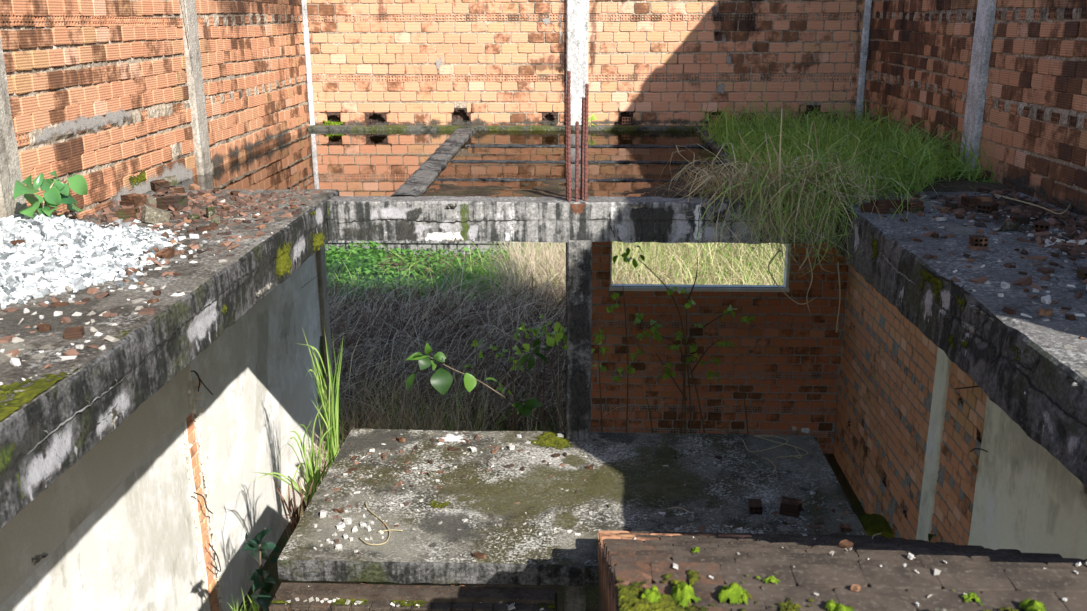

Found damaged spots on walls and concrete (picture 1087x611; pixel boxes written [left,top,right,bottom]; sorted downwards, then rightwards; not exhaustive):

damp [340,204,478,241]
damp [616,204,758,242]
damp [0,288,110,338]
damp [187,301,217,350]
damp [924,289,957,329]
crack [880,252,1087,427]
damp [96,391,130,439]
damp [1042,412,1081,457]
damp [0,421,78,502]
damp [419,513,482,547]